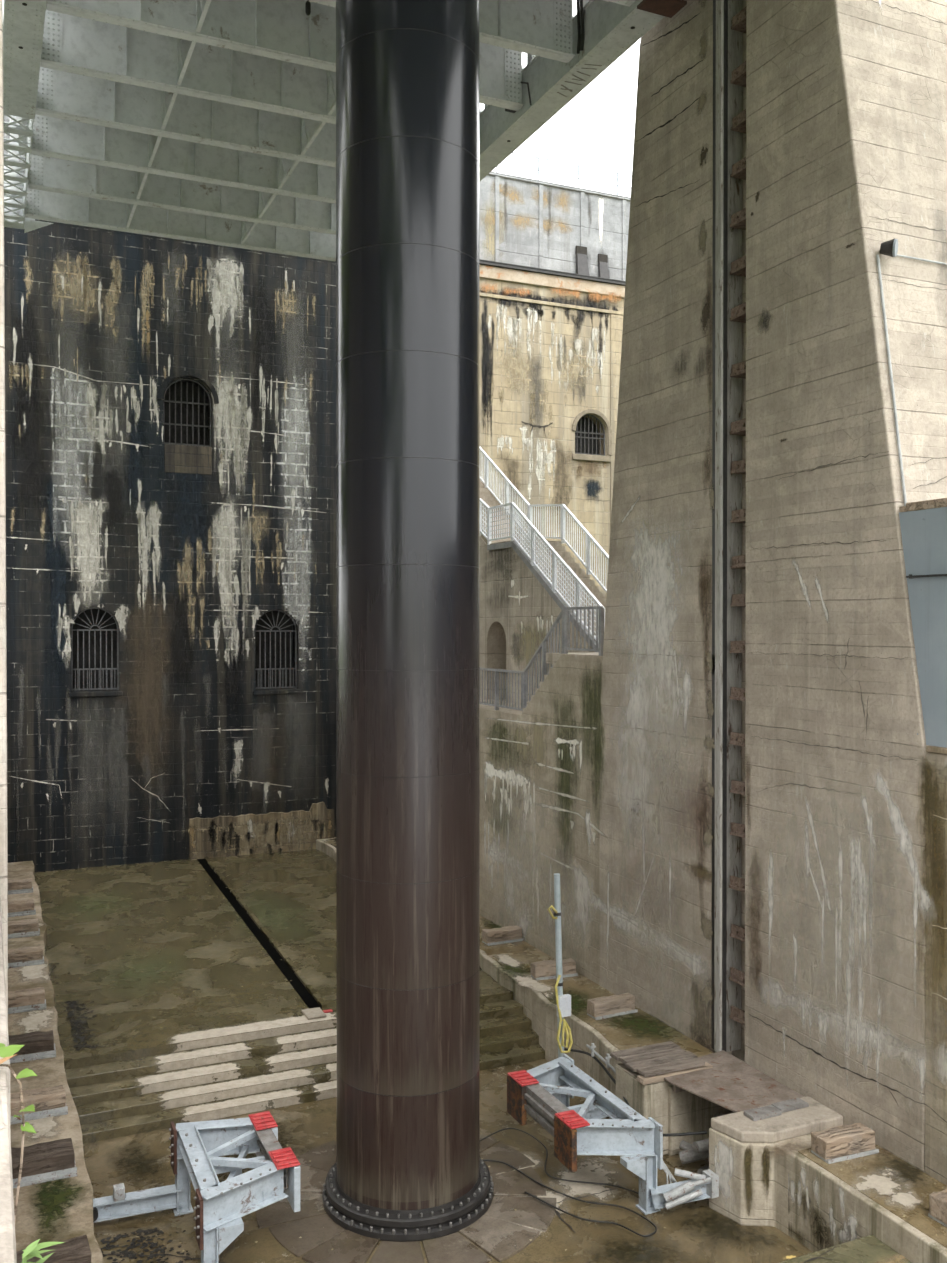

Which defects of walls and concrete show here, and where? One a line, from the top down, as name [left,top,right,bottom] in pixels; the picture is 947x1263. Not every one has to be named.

crack [636,60,703,142]
crack [643,15,697,46]
crack [638,179,700,206]
corrosion [553,288,620,301]
damp [480,288,618,509]
damp [9,251,317,842]
damp [181,695,331,858]
damp [484,677,605,936]
damp [588,672,704,975]
damp [764,765,947,1088]
crack [749,1014,946,1122]
damp [714,1141,770,1199]